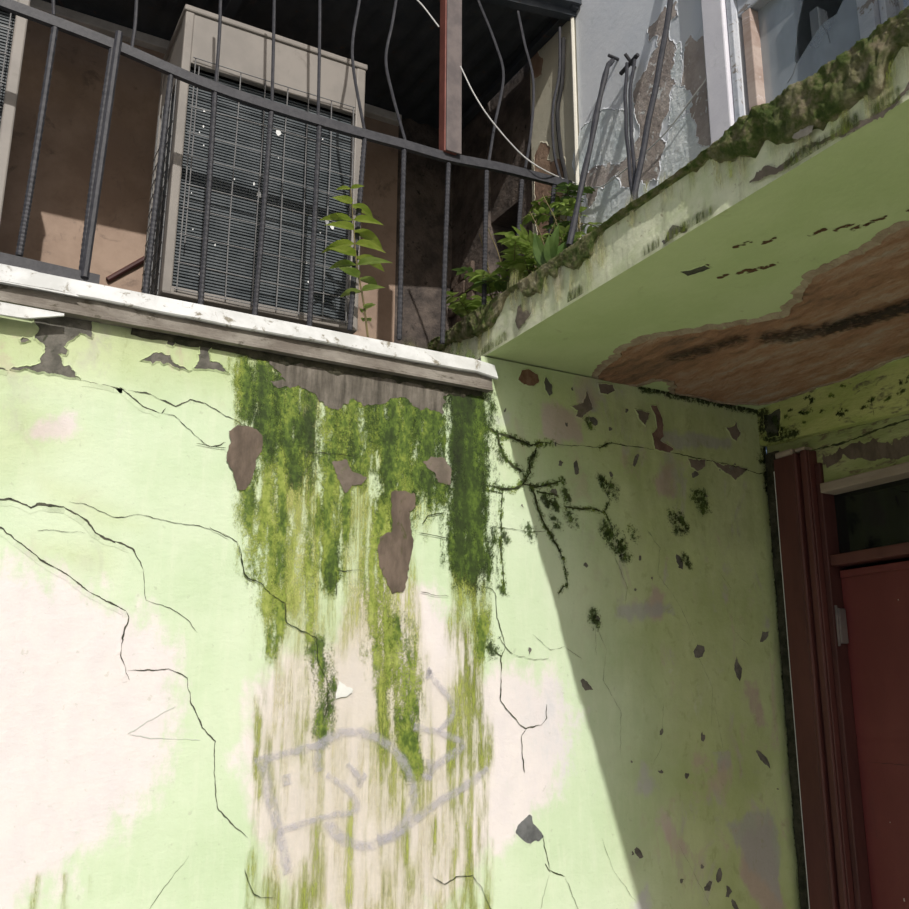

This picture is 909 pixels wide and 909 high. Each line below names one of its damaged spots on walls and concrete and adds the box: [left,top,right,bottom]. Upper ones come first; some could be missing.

peeling [534,0,711,244]
spalling [9,317,94,381]
spalling [564,221,909,432]
crack [82,380,246,448]
spalling [227,425,263,490]
leakage [540,488,579,531]
leakage [598,519,640,565]
leakage [667,509,690,536]
crack [481,428,643,772]
leakage [587,607,601,631]
crack [0,498,329,835]
crack [541,835,578,908]